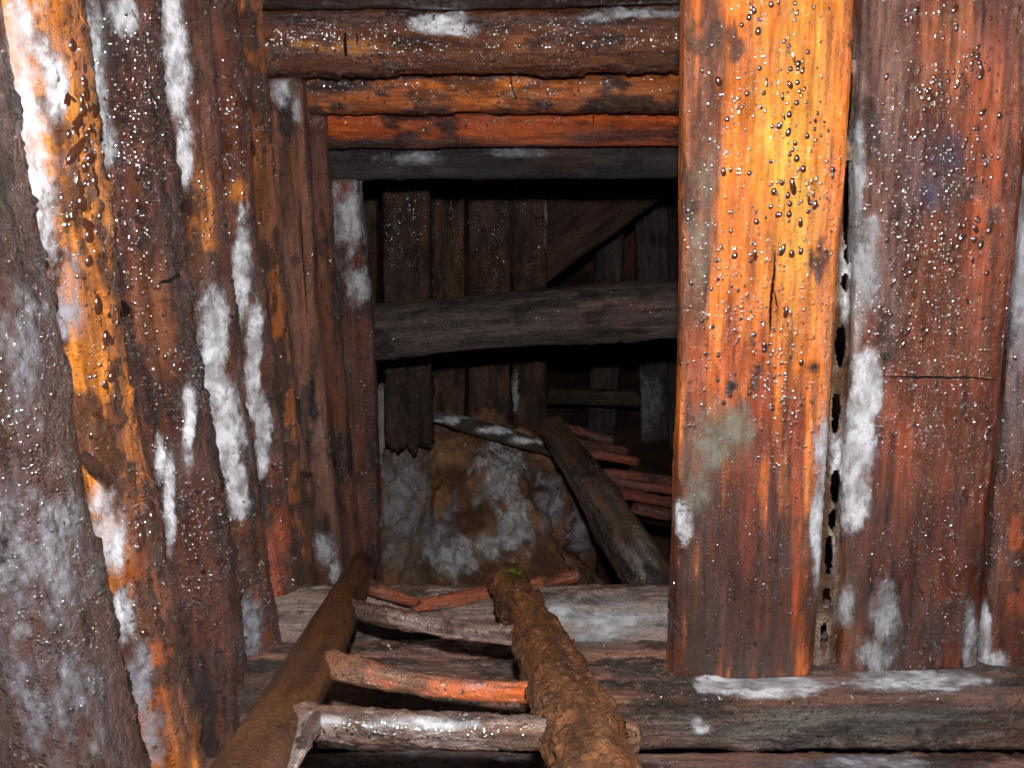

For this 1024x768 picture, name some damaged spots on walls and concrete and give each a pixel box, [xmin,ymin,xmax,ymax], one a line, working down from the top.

water stain [412,11,471,36]
water stain [10,0,70,250]
water stain [162,0,193,184]
water stain [848,113,866,213]
crack [769,250,778,335]
water stain [183,236,271,520]
water stain [93,489,124,568]
water stain [155,442,176,543]
water stain [810,348,882,585]
water stain [113,594,133,631]
mould [695,675,835,698]
mould [856,593,1004,691]